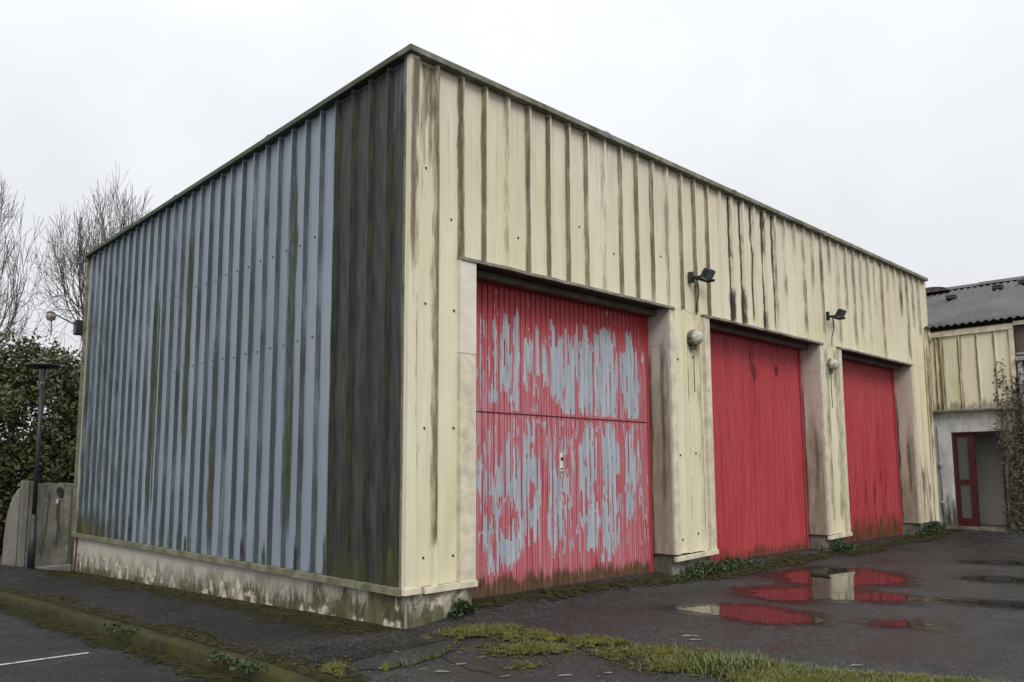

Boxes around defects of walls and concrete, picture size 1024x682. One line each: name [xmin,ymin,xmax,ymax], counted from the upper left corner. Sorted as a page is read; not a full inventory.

leakage [677,174,712,316]
leakage [727,197,777,329]
leakage [813,237,828,300]
leakage [73,57,665,629]
peeling [476,301,649,576]
leakage [802,391,818,530]